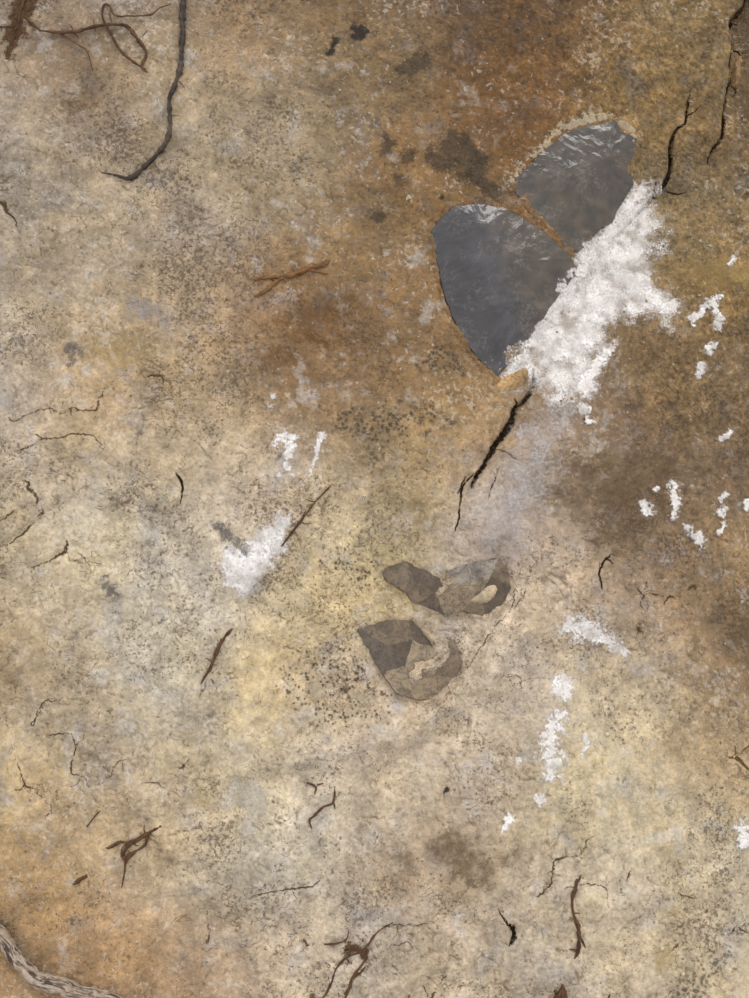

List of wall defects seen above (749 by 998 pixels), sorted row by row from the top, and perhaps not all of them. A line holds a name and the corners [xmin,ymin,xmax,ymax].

crack [707,0,747,164]
crack [620,90,699,233]
water stain [501,183,725,424]
crack [455,373,536,531]
crack [255,872,326,899]